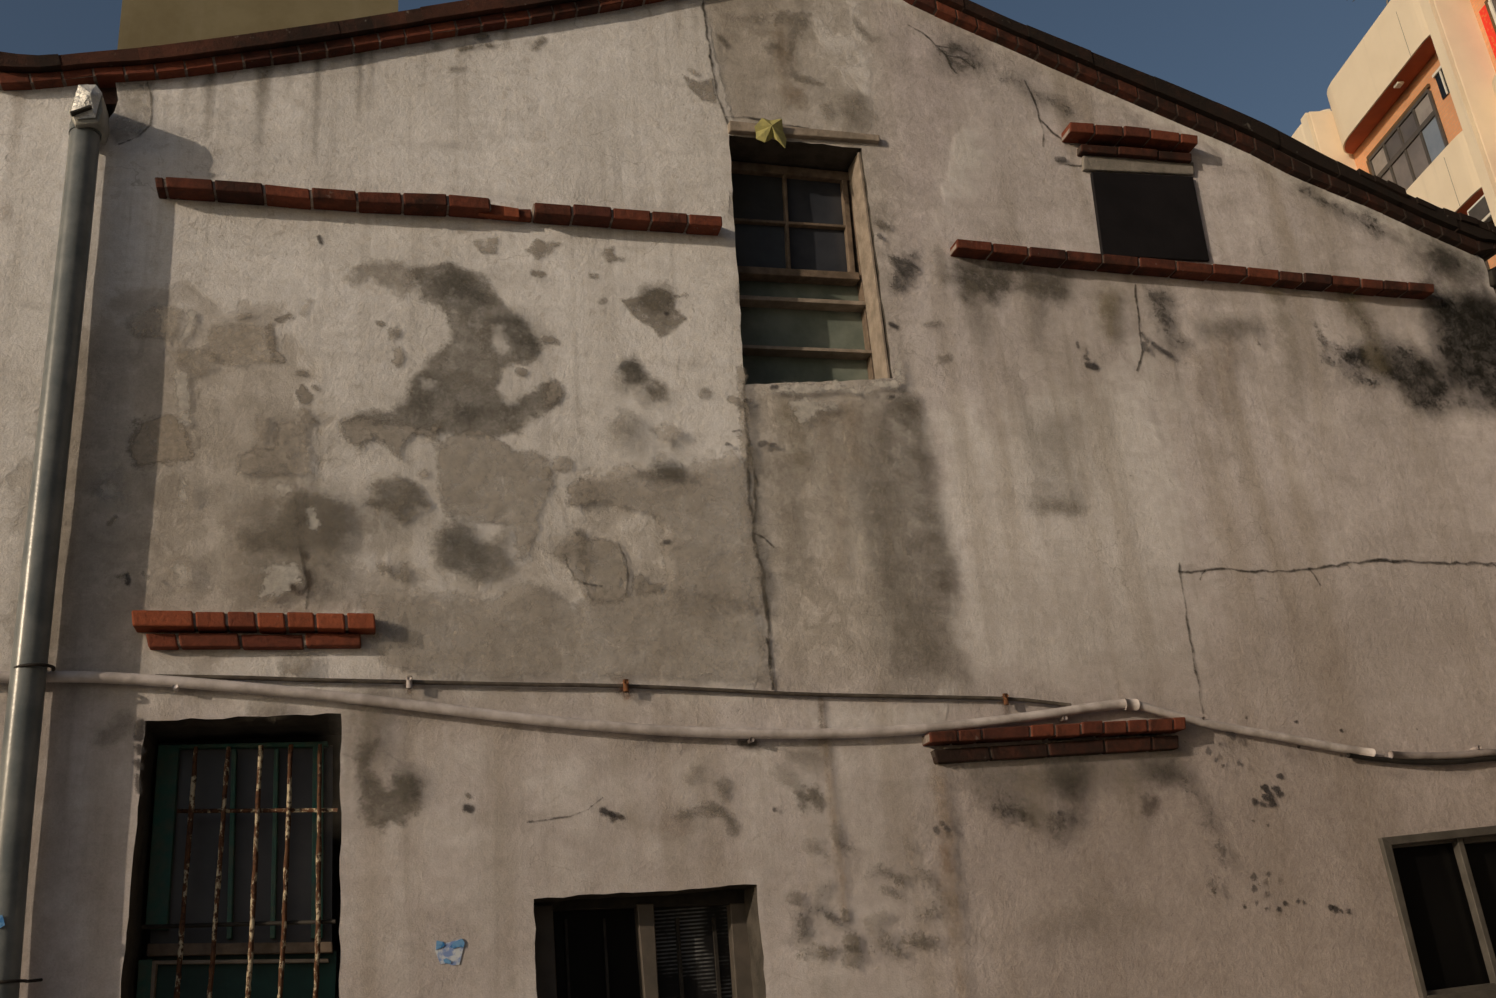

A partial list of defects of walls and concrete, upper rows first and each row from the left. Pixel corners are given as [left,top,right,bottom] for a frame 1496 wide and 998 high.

crack [909,25,974,73]
crack [1025,82,1082,167]
crack [1134,284,1144,371]
damp [1316,297,1496,410]
crack [743,383,775,690]
crack [1178,558,1496,712]
spalling [1252,773,1284,826]